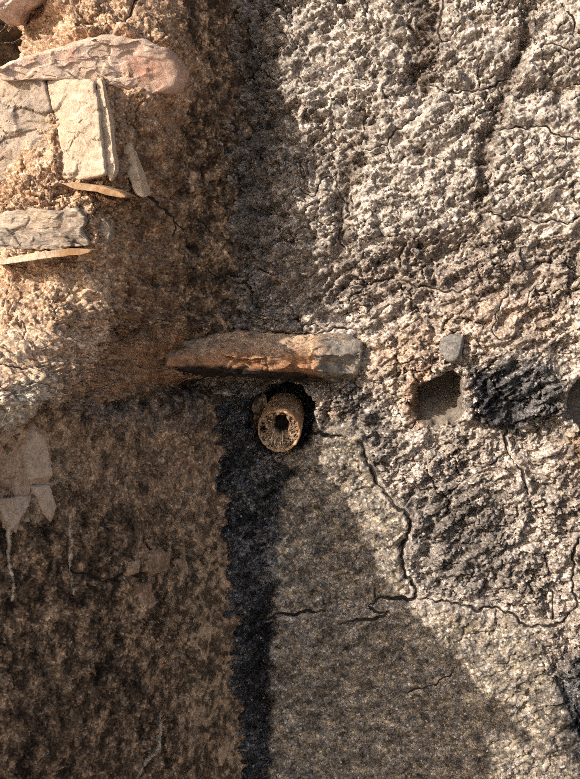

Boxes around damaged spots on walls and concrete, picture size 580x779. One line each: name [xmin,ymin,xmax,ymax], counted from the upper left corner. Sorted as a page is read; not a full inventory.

crack [542,11,580,51]
crack [422,79,507,94]
crack [364,114,421,163]
crack [487,125,580,152]
crack [478,211,580,225]
crack [264,327,357,335]
crack [396,279,470,293]
crack [491,278,545,341]
crack [489,404,528,494]
crack [311,431,580,628]
damp [6,530,15,601]
damp [137,711,163,779]